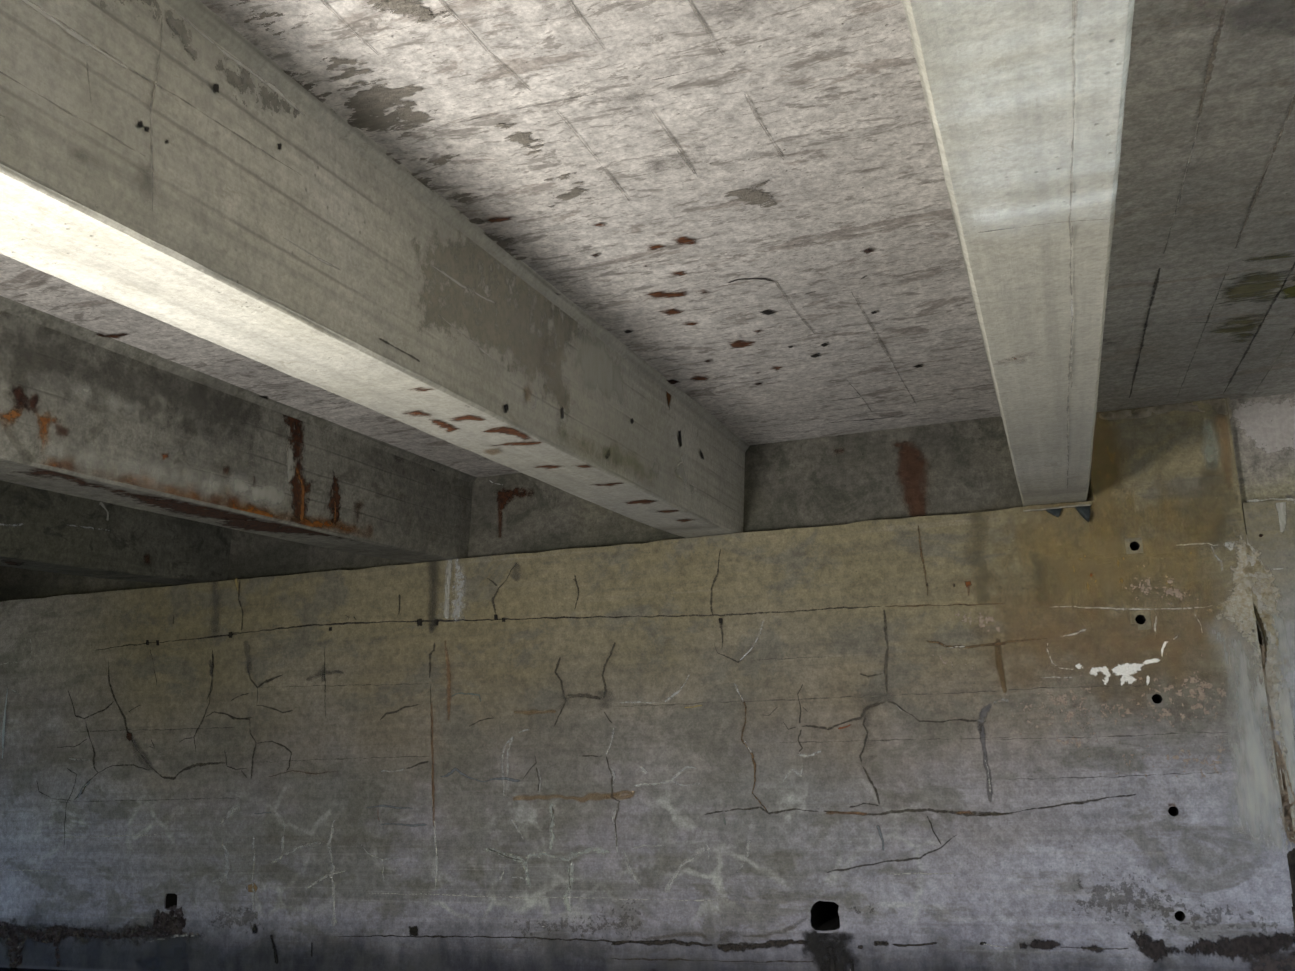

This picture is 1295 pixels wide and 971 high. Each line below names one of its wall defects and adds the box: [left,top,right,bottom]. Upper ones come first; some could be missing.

corrosion [647,237,695,251]
corrosion [646,272,697,326]
corrosion [729,330,762,348]
corrosion [0,387,362,538]
peeling [1122,565,1199,606]
crack [37,582,343,845]
crack [554,643,615,726]
crack [705,549,1136,873]
peeling [998,647,1237,779]
crack [583,755,620,846]
damp [802,929,855,971]
damp [1019,939,1061,950]